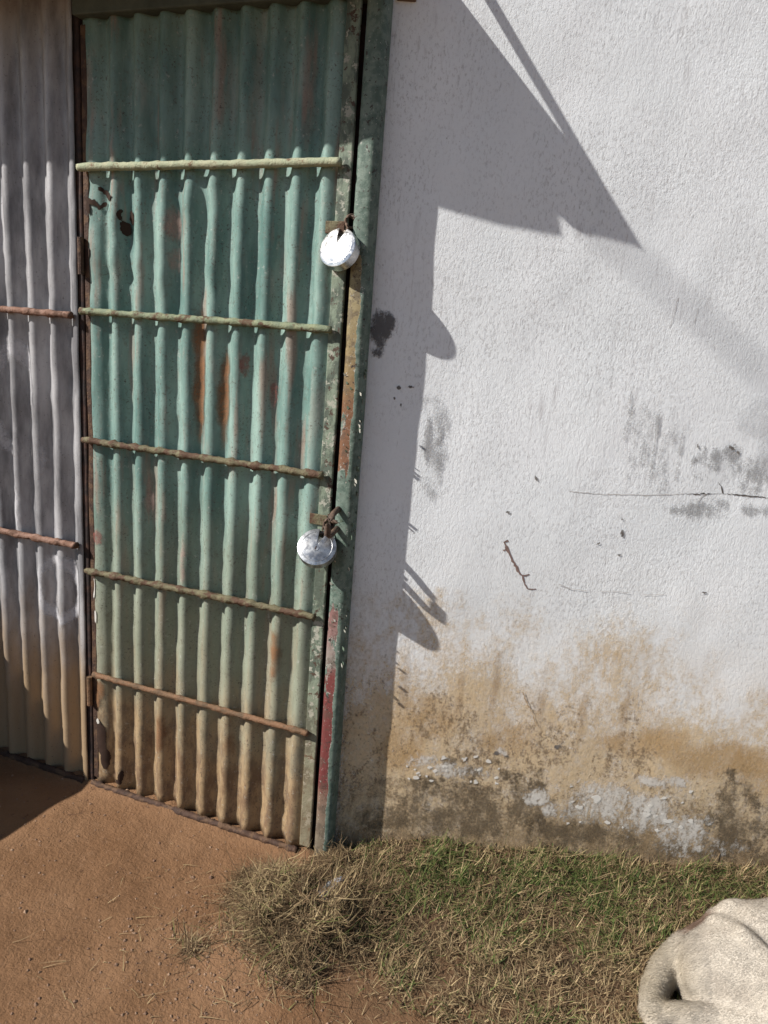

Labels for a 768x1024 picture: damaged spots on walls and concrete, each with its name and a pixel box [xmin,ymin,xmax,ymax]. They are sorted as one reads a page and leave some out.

water stain [370,311,396,358]
rust [194,324,205,423]
rust [218,360,229,425]
crack [569,482,765,502]
rust [95,683,104,706]
water stain [363,761,640,849]
water stain [654,770,768,864]